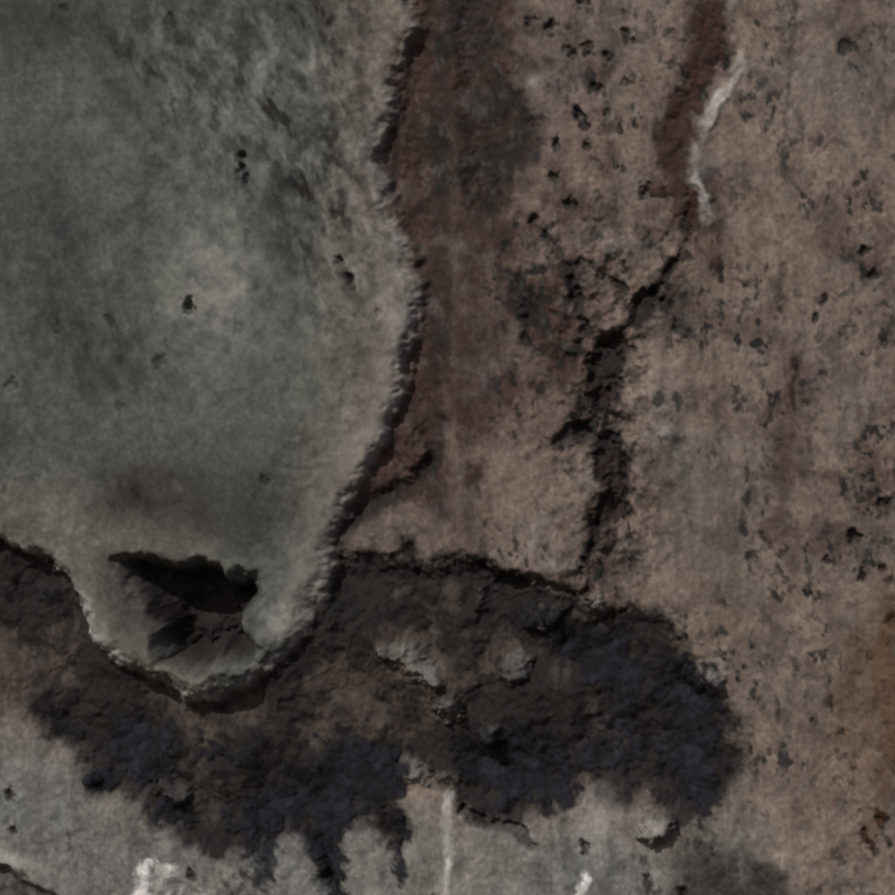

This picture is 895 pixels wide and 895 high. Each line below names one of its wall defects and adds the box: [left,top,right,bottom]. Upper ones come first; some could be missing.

spalling [573,106,593,151]
spalling [562,41,614,62]
spalling [639,0,746,227]
spalling [335,0,561,536]
crack [514,274,538,349]
crack [539,191,700,605]
damp [81,706,412,895]
spalling [0,516,747,864]
damp [576,873,592,895]
damp [446,599,733,815]
damp [676,857,786,895]
spalling [860,808,889,859]